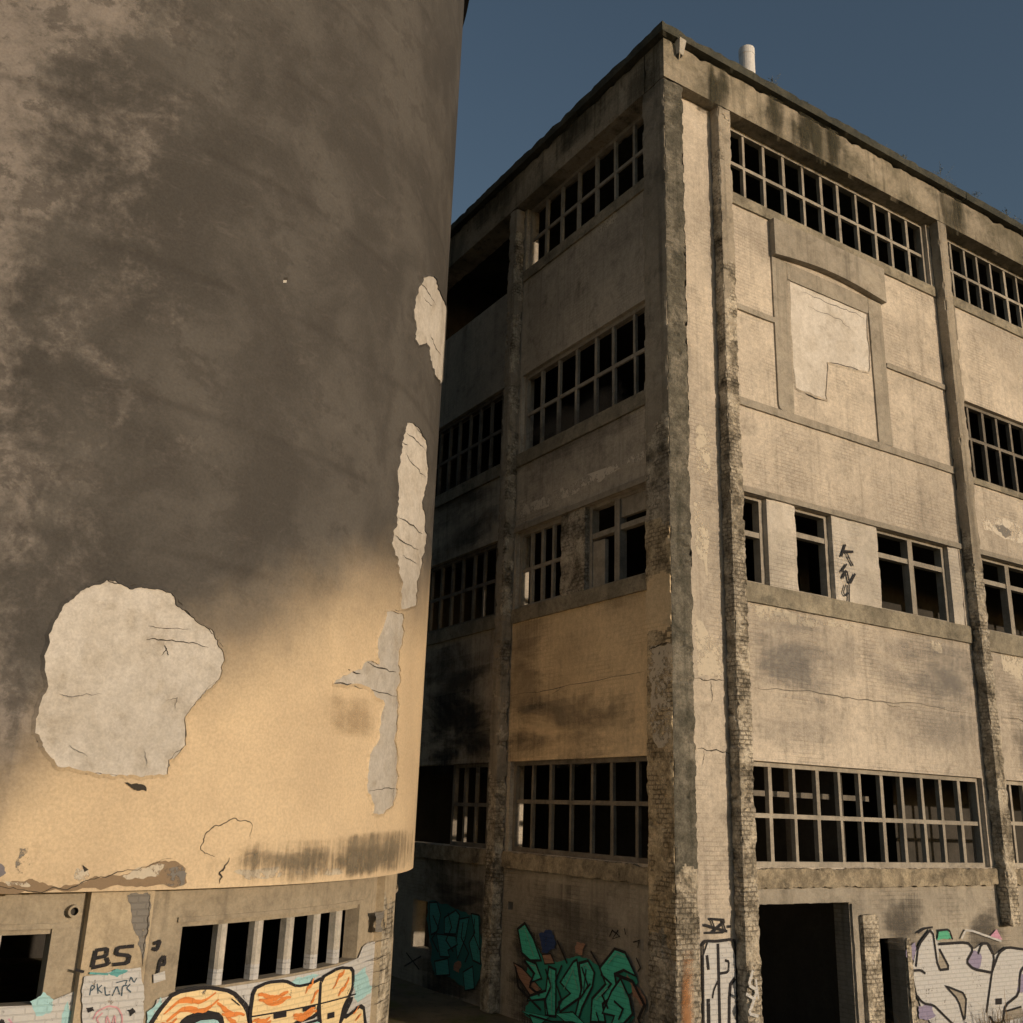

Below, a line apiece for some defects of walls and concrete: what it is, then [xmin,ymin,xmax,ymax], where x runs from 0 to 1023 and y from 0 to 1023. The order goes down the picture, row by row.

water stain [709,68,729,108]
water stain [767,96,840,161]
peeling [412,274,447,386]
peeling [788,280,871,402]
peeling [332,420,429,818]
peeling [31,577,227,791]
crack [755,687,966,713]
peeling [1001,654,1023,681]
crack [200,818,253,884]
water stain [253,849,327,875]
water stain [339,833,408,872]
spalling [0,848,187,963]